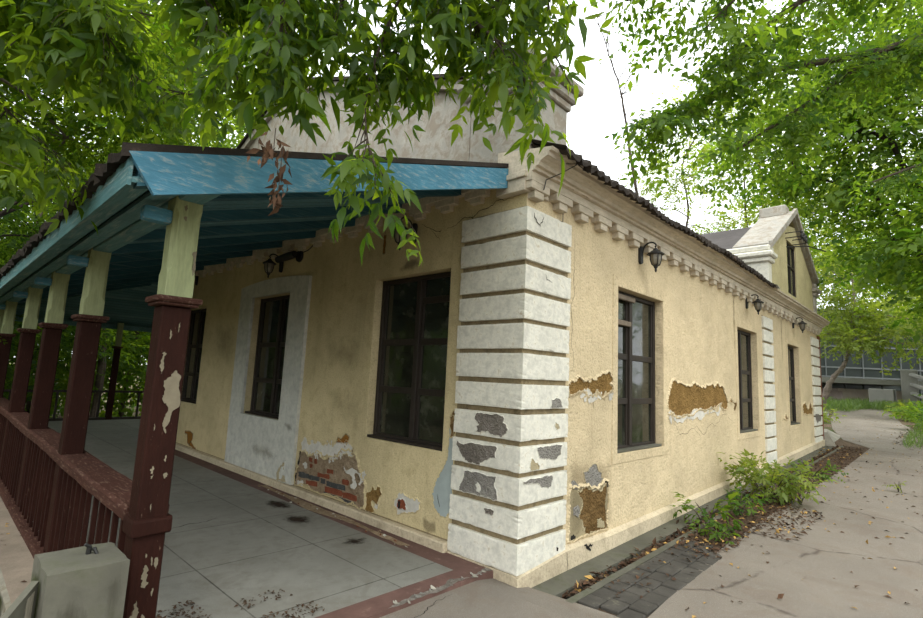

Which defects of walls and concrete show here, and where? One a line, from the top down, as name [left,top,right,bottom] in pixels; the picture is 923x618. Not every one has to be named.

peeling [154,352,182,434]
flaking render [551,369,614,409]
flaking render [667,378,737,424]
flaking render [802,401,821,423]
flaking render [276,436,383,513]
peeling [432,410,509,518]
peeling [523,444,563,489]
peeling [394,491,422,516]
flaking render [566,463,610,544]
peeling [141,554,158,596]